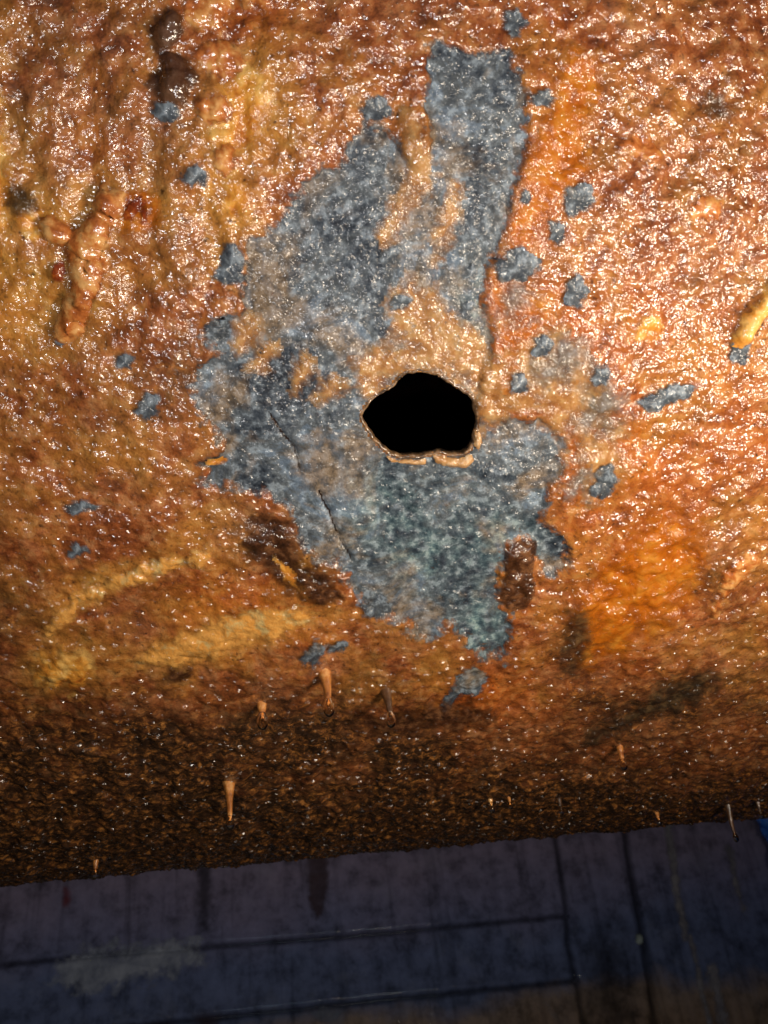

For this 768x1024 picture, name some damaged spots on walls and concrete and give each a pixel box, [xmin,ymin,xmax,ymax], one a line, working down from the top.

corrosion [0,127,162,344]
corrosion [635,315,665,344]
corrosion [731,284,768,349]
corrosion [137,39,631,737]
peeling [387,431,482,468]
corrosion [43,550,211,638]
corrosion [564,516,707,664]
corrosion [708,550,761,619]
corrosion [35,651,93,689]
water stain [561,610,590,672]
water stain [584,672,717,747]
corrosion [222,781,235,830]